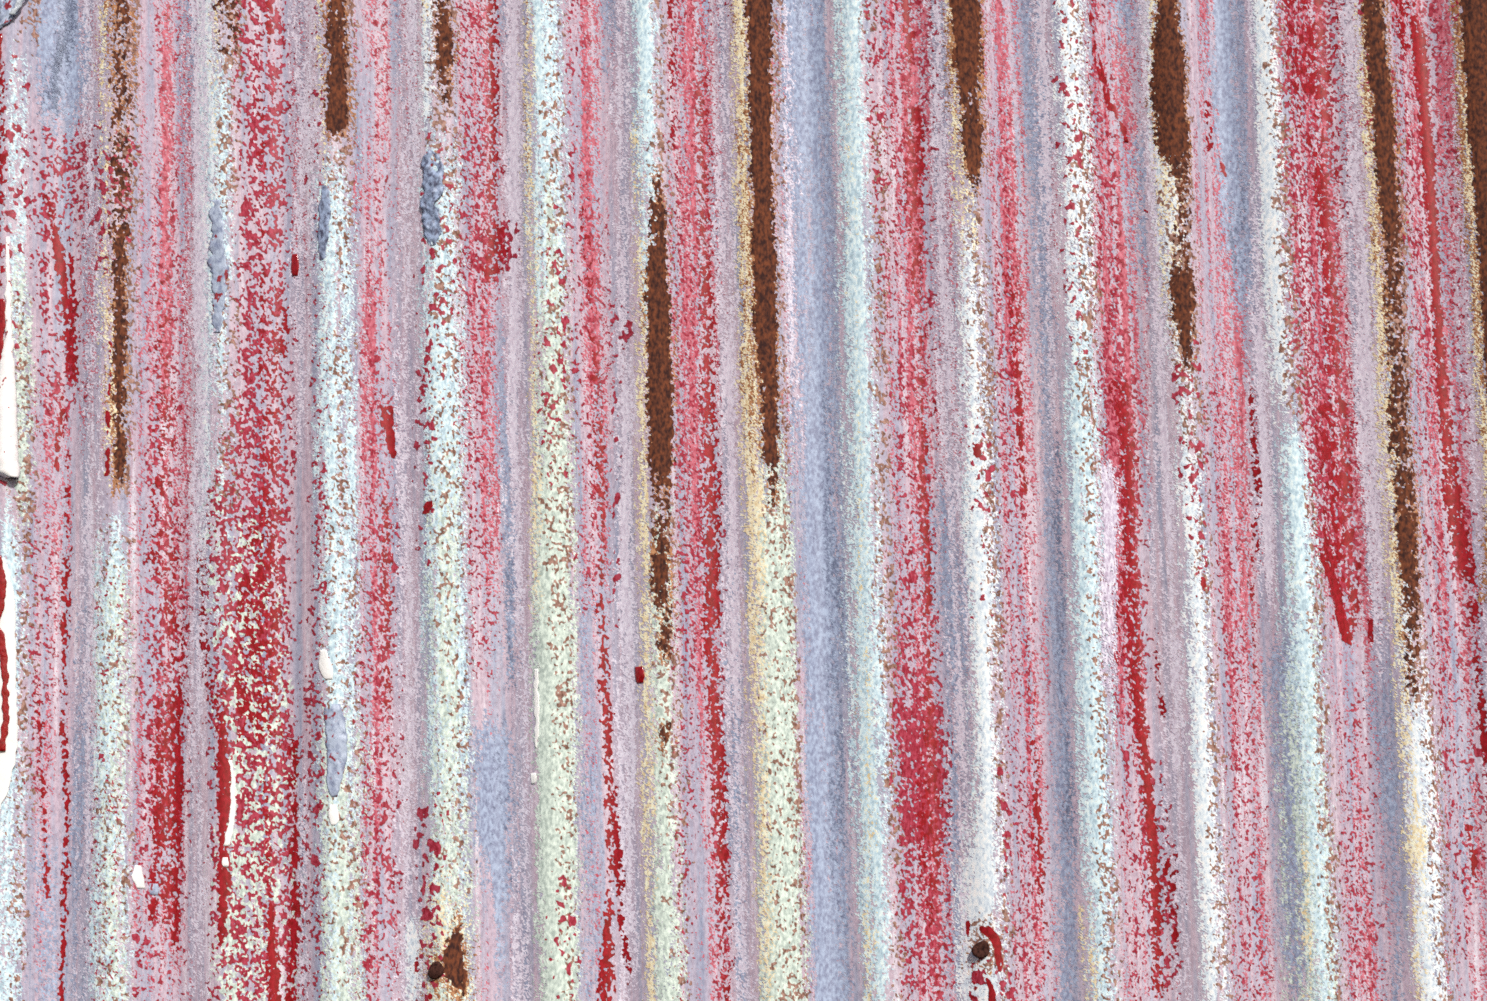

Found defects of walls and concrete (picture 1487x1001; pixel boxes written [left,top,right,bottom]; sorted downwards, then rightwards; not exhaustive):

peeling [0,0,523,1001]
corrosion [313,0,373,1001]
corrosion [414,0,483,1001]
peeling [533,0,634,1001]
corrosion [628,0,699,1001]
corrosion [727,0,815,1001]
corrosion [942,0,1021,1001]
corrosion [1059,1,1127,1001]
corrosion [1144,0,1212,465]
corrosion [1352,0,1457,1001]
corrosion [1447,0,1487,607]